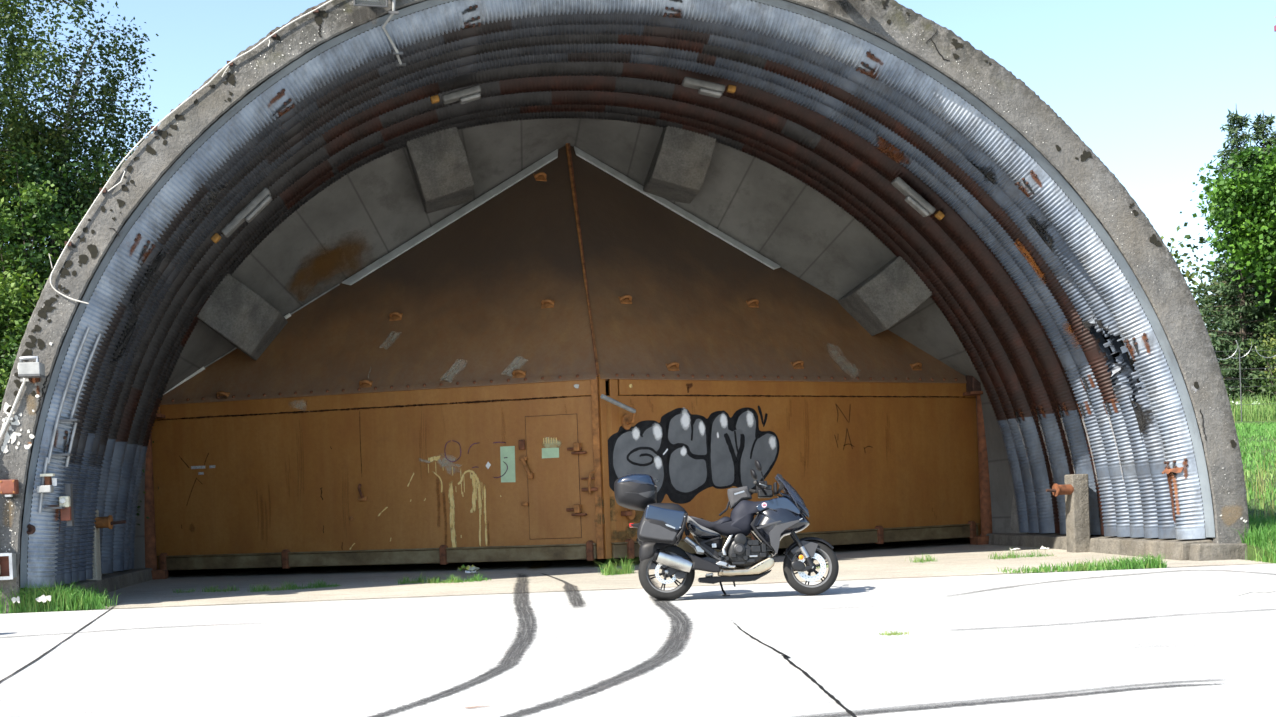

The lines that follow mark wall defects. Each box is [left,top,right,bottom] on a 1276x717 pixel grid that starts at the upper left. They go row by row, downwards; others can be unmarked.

rust [856,51,883,80]
rust [1014,170,1042,199]
peeling [1108,343,1126,397]
peeling [0,394,39,453]
rust [1164,458,1188,523]